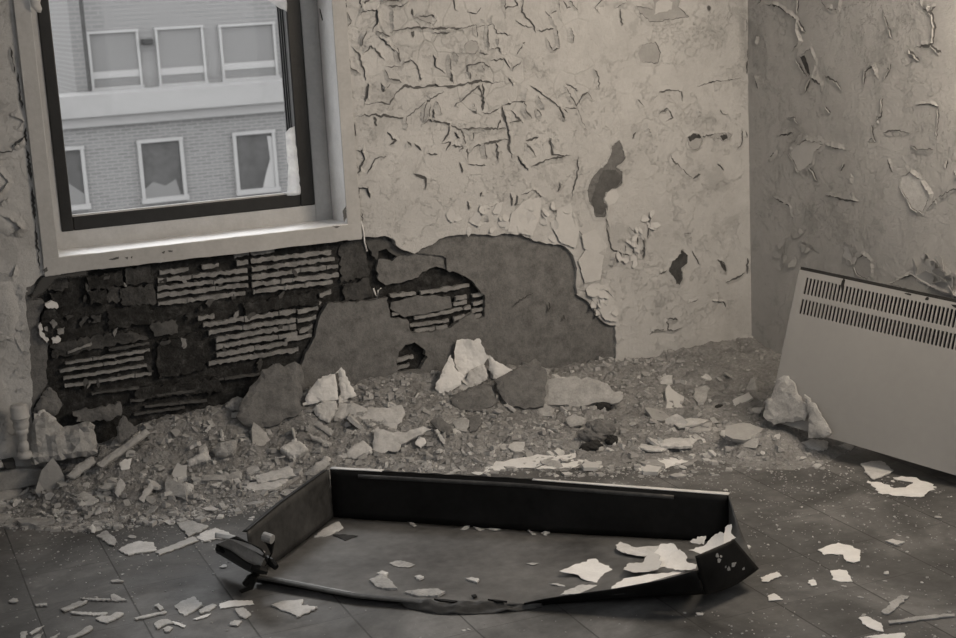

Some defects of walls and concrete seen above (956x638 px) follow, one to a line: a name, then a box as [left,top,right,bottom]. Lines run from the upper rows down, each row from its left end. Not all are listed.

peeling [625,0,692,26]
peeling [635,38,664,68]
crack [346,0,628,250]
crack [632,0,956,213]
crack [0,47,42,282]
spalling [14,139,661,443]
crack [596,208,668,299]
spalling [666,249,690,288]
crack [685,233,700,264]
crack [650,258,751,335]
peeling [889,252,956,299]